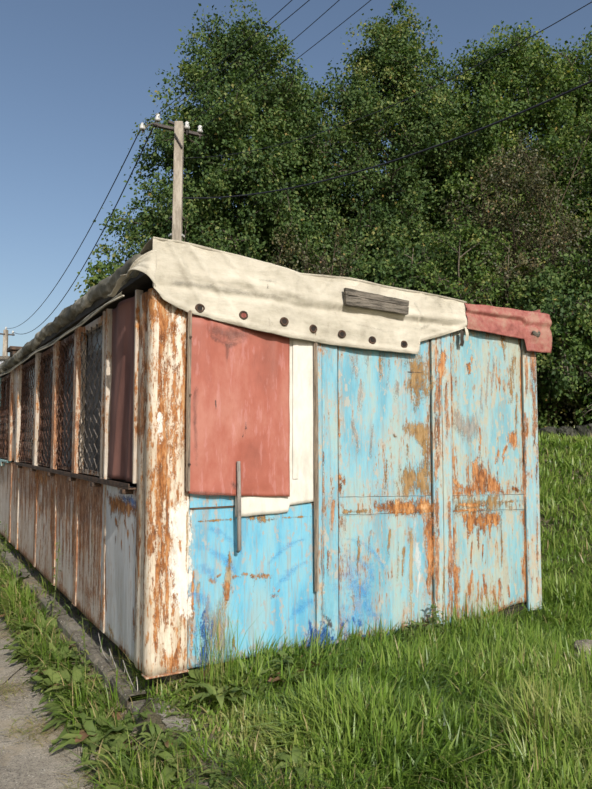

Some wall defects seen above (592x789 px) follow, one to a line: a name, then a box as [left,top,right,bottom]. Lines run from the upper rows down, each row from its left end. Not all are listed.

peeling [453,363,495,443]
peeling [501,336,518,433]
rust [7,299,195,673]
rust [321,348,539,623]
rust [216,551,233,646]